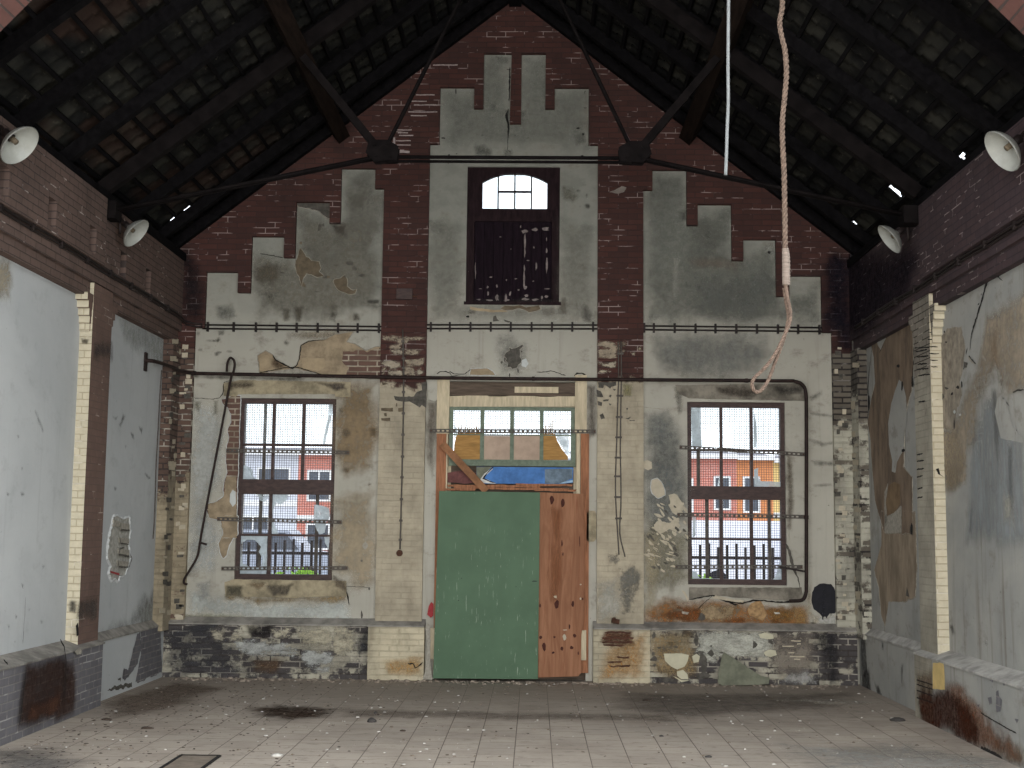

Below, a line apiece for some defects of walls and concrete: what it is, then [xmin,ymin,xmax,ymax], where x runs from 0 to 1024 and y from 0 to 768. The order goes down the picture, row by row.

crack [505,68,516,151]
spalling [466,225,549,323]
crack [963,276,1003,369]
spalling [257,331,427,421]
flaking render [936,296,1024,488]
spalling [106,514,132,583]
spalling [207,395,241,559]
peeling [644,460,690,572]
flaking render [834,325,918,637]
rust [601,600,807,682]
peeling [694,631,773,679]
rust [917,678,1022,762]